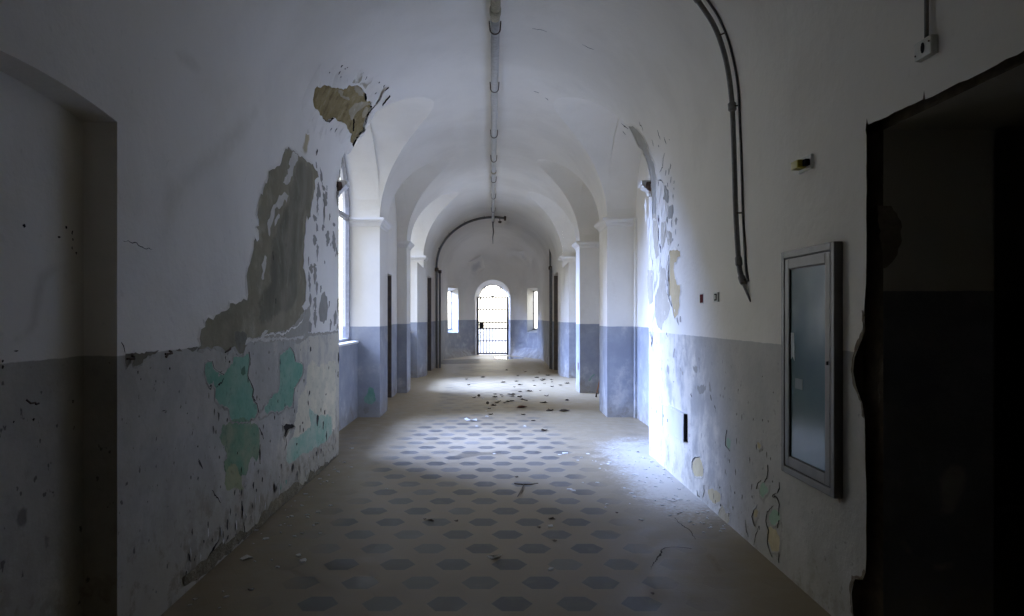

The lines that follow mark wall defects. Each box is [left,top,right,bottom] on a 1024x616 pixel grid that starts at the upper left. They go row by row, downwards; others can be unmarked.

peeling [176,64,390,586]
peeling [622,124,707,395]
peeling [692,454,722,507]
peeling [752,465,783,563]